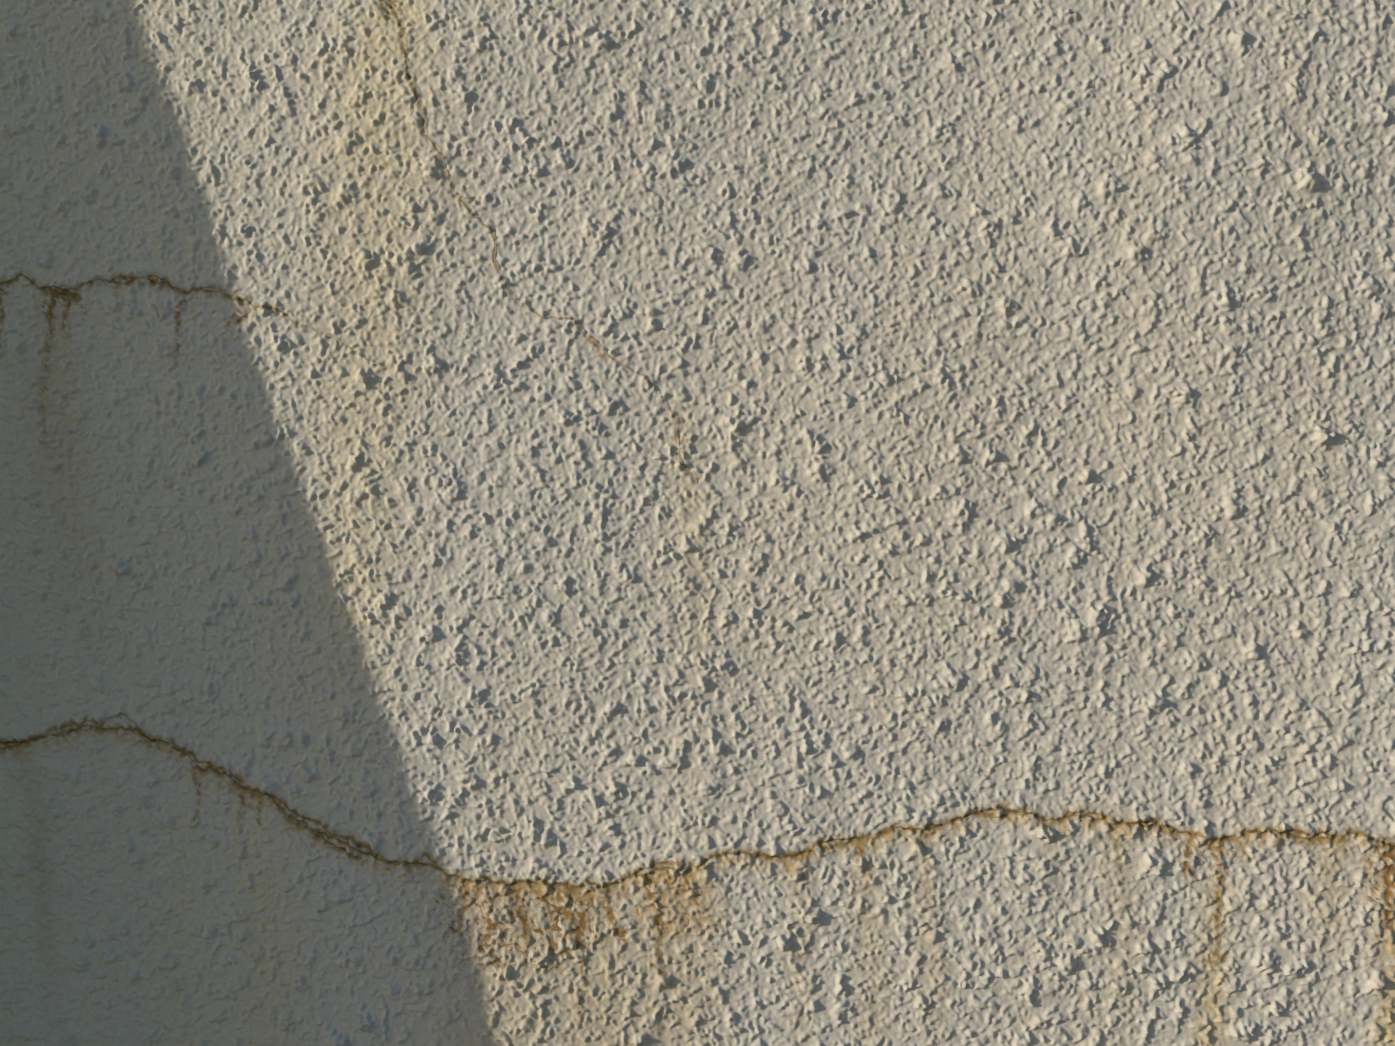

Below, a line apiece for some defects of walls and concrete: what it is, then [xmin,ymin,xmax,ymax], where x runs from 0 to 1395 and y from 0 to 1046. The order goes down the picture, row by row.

crack [0,267,382,366]
crack [369,0,697,484]
crack [0,711,1395,907]
rust [395,868,731,1027]
rust [1169,831,1253,968]
rust [1346,824,1395,970]